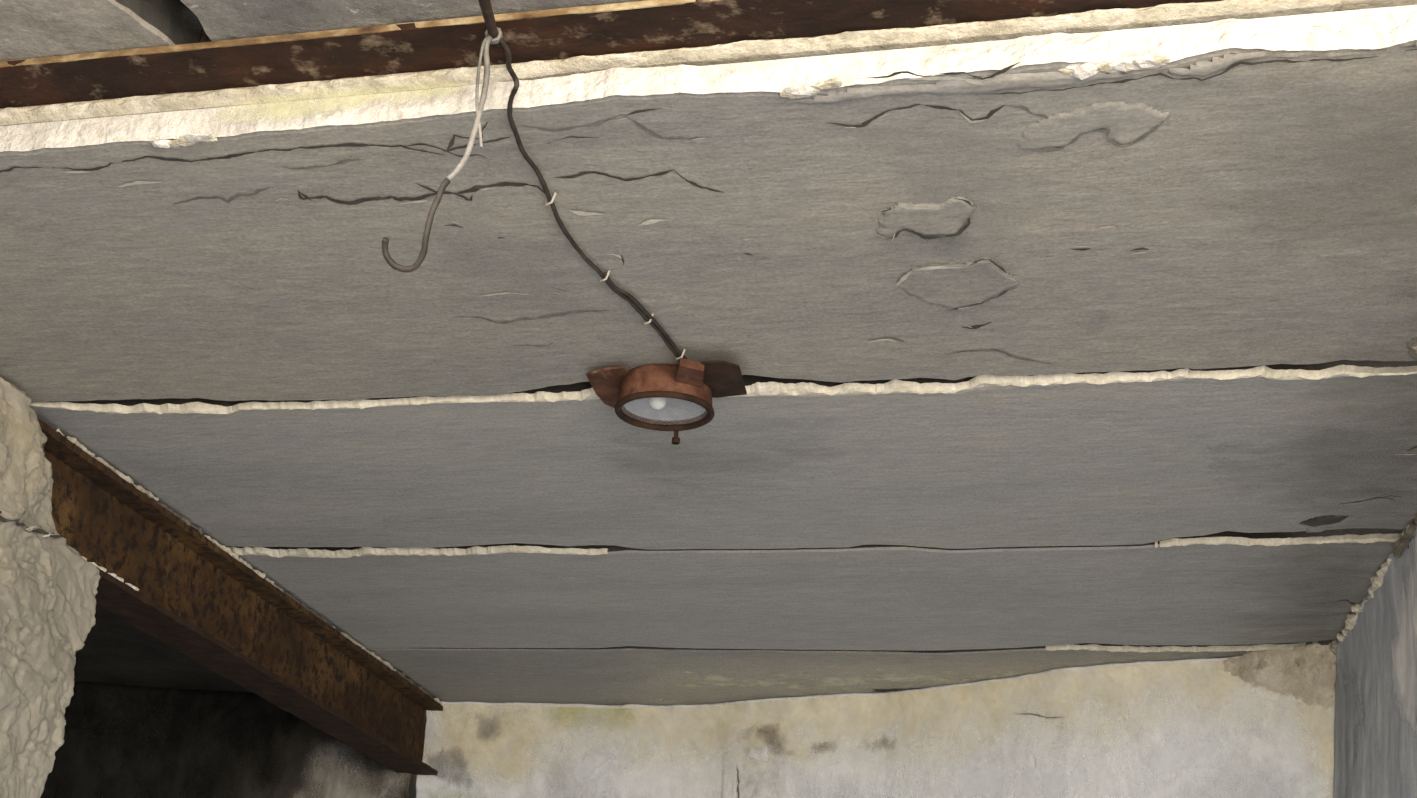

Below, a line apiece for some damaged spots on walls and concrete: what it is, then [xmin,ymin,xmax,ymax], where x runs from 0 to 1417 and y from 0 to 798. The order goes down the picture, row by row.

crack [829,62,1049,128]
peeling [150,132,217,149]
crack [0,109,722,216]
crack [637,218,669,226]
crack [460,292,600,347]
crack [867,337,1052,364]
crack [1342,496,1401,504]
peeling [1330,512,1417,655]
leakage [40,682,292,798]